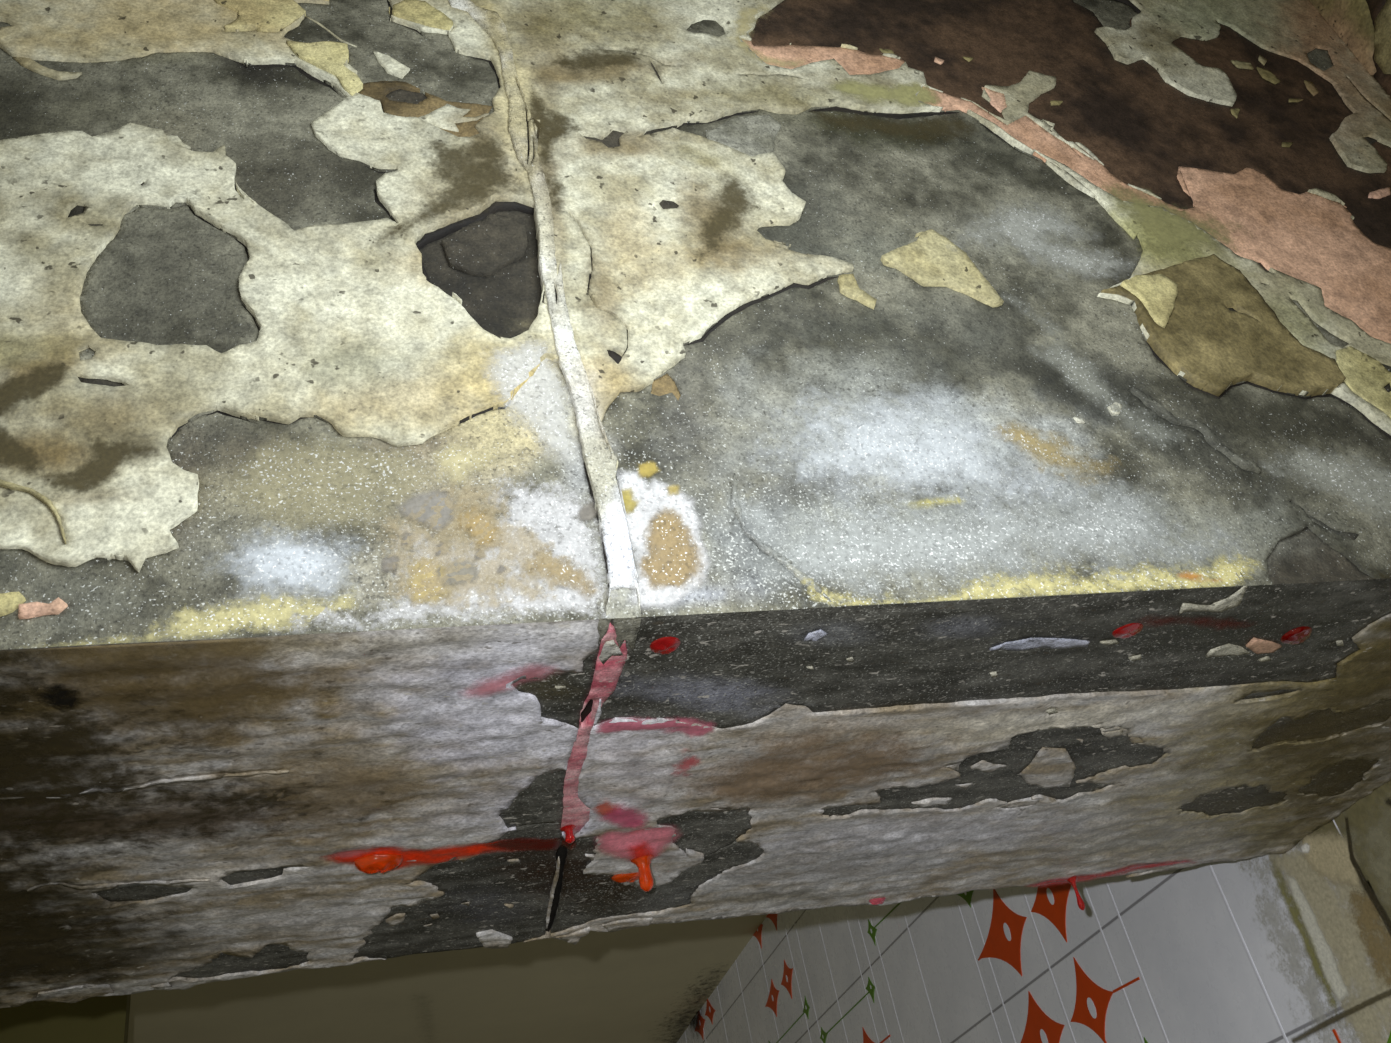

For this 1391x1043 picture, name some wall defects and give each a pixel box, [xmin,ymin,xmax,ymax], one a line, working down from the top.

peeling [0,0,501,231]
peeling [68,203,261,360]
spalling [416,201,542,338]
peeling [0,360,614,650]
crack [448,0,642,932]
damp [618,462,709,607]
peeling [513,0,1391,817]
damp [0,447,615,1004]
damp [599,718,712,735]
peeling [222,867,290,885]
peeling [353,770,764,959]
damp [596,803,677,860]